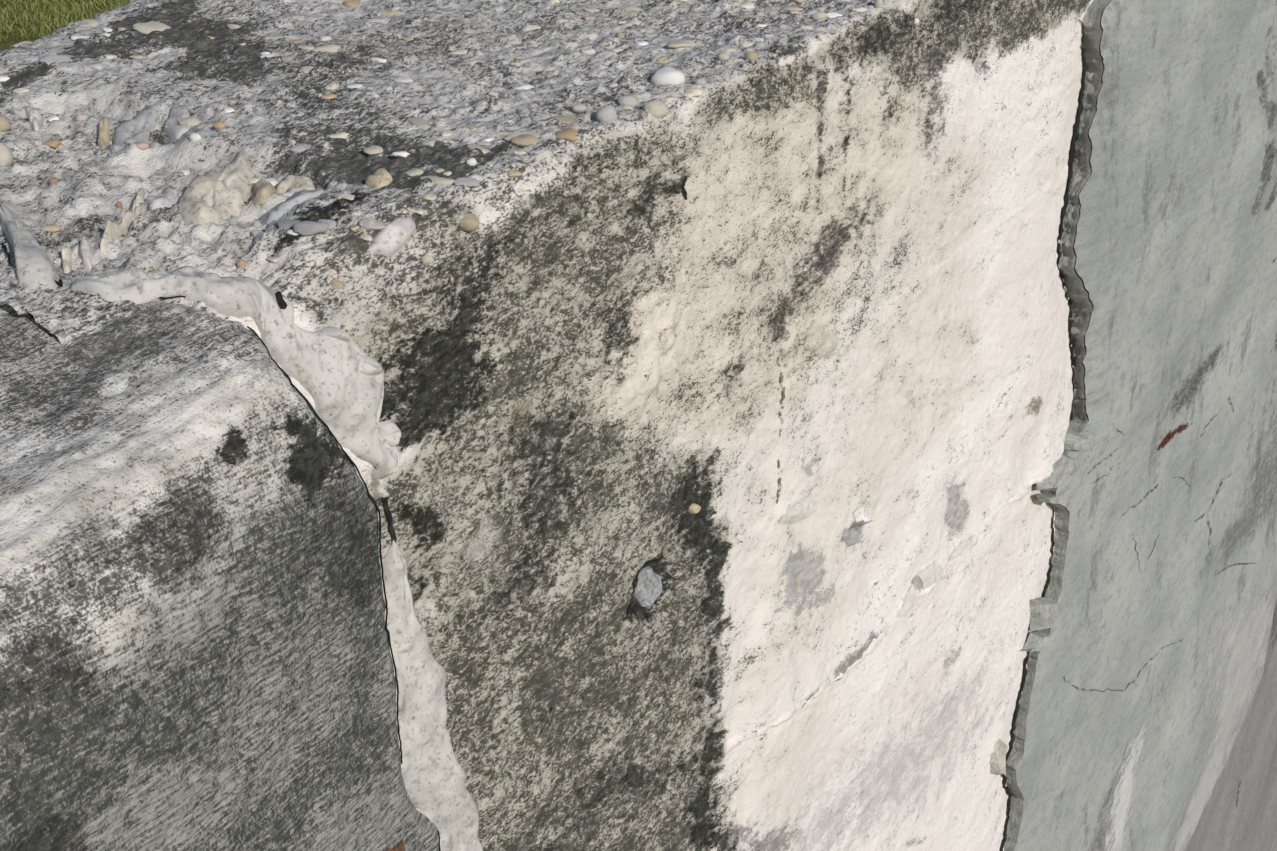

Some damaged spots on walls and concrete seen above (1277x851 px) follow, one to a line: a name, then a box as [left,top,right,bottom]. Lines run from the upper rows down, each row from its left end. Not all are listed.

damp [816,0,1003,206]
damp [216,428,251,466]
crack [247,326,403,764]
damp [265,413,446,619]
damp [377,237,513,452]
damp [483,410,594,620]
damp [546,436,800,851]
damp [762,176,887,373]
crack [1041,490,1055,598]
crack [1058,19,1086,422]
rust [1156,422,1188,452]
crack [1001,651,1029,851]